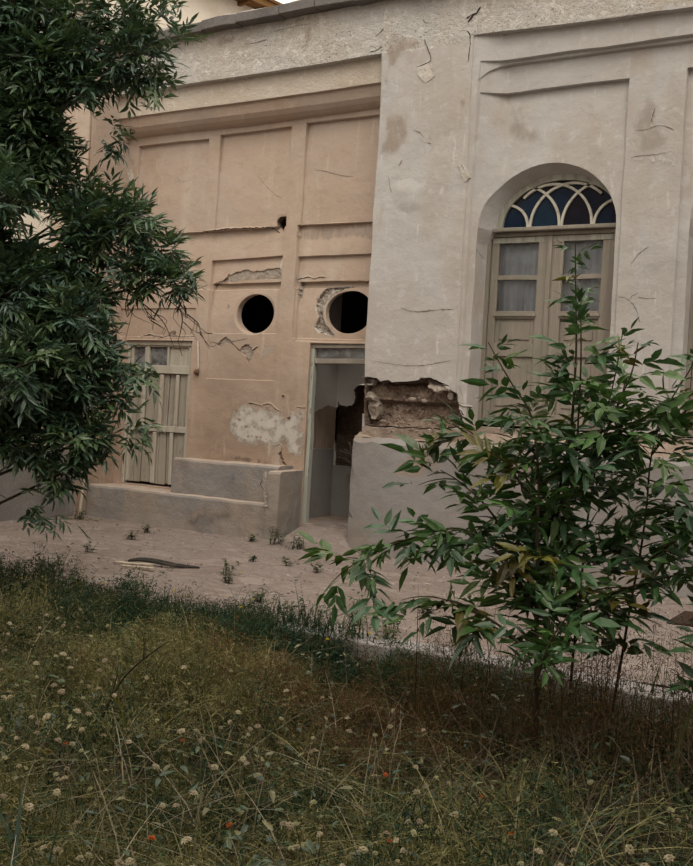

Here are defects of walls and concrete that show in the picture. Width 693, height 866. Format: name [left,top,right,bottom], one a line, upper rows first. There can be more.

crack [466,5,484,62]
crack [645,106,673,130]
spalling [215,258,283,286]
spalling [314,285,354,336]
spalling [210,337,258,362]
spalling [336,377,463,435]
peeling [230,401,306,465]